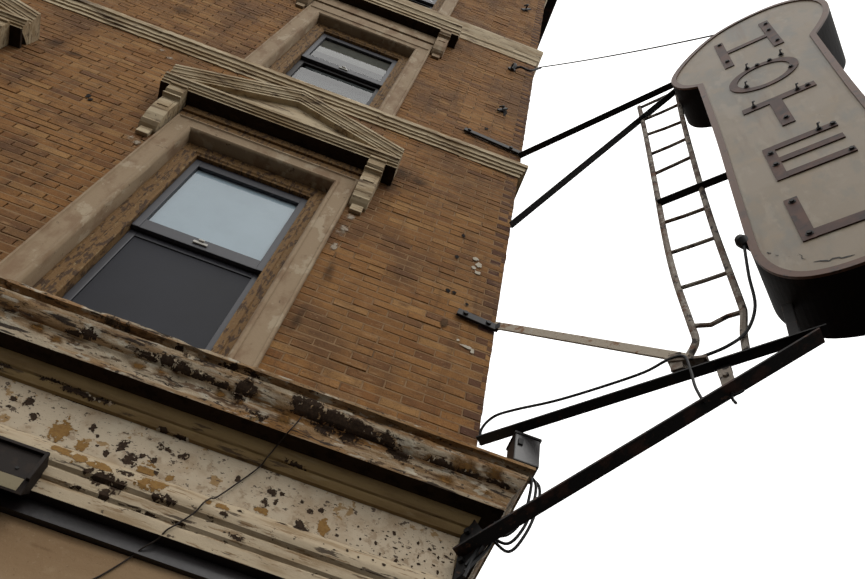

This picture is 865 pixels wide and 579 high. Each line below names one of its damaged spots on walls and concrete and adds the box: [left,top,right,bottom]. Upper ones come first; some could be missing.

peeling [6,393,40,422]
peeling [35,375,116,407]
peeling [131,344,260,403]
peeling [247,410,269,422]
peeling [289,394,411,465]
peeling [43,416,190,507]
peeling [422,454,511,490]
peeling [205,488,285,516]
peeling [278,500,361,558]
peeling [372,529,453,579]